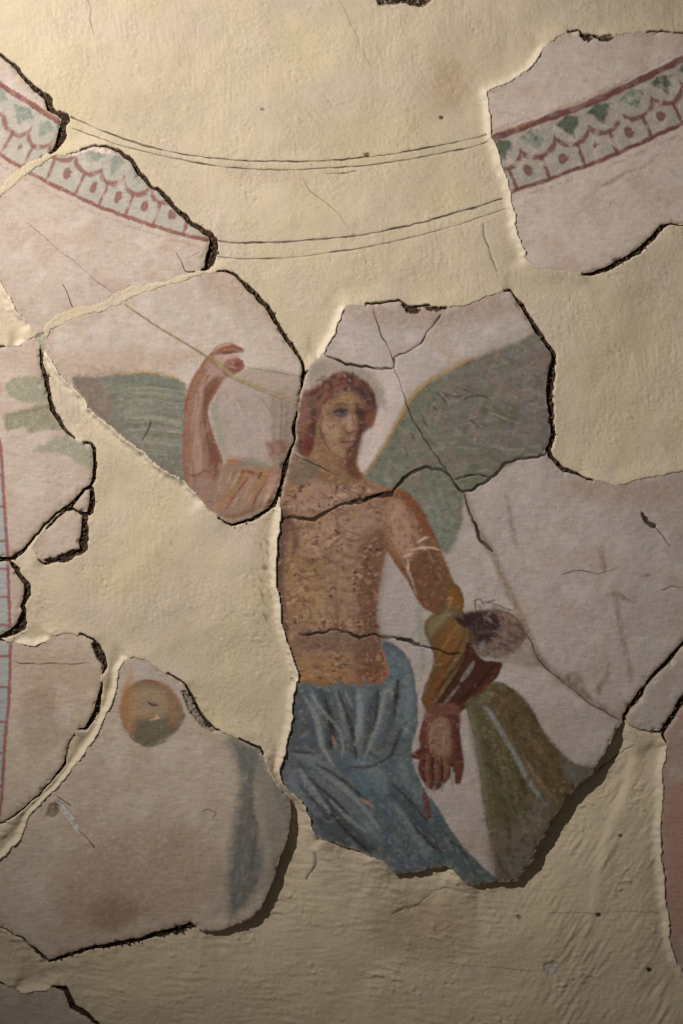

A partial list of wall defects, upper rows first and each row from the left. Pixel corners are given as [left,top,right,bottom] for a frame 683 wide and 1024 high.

peeling [60,147,111,157]
crack [0,53,593,552]
spalling [402,305,447,314]
crack [0,350,98,639]
crack [302,630,461,655]
crack [527,634,683,720]
peeling [46,800,80,831]